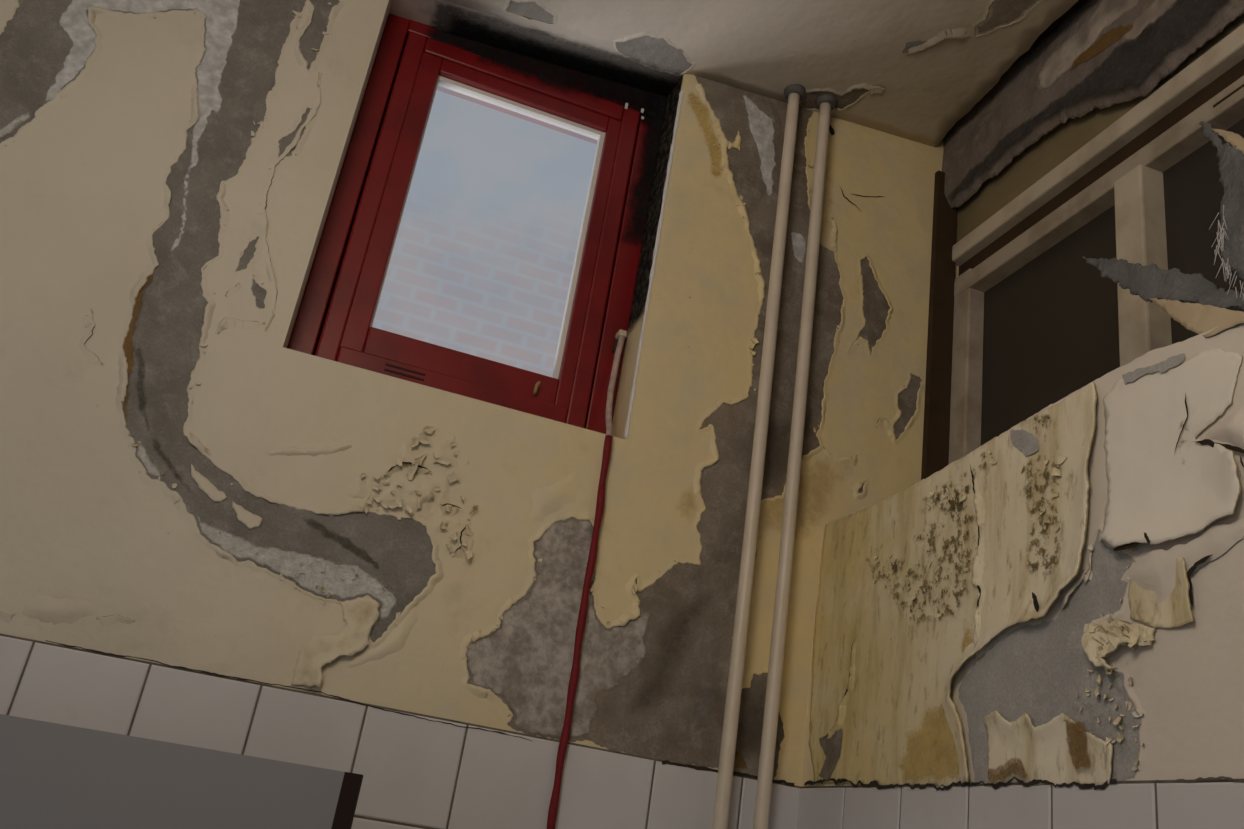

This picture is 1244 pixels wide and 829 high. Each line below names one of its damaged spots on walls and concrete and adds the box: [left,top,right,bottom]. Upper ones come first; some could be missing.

peeling [502,0,558,27]
peeling [612,31,696,76]
peeling [902,28,972,56]
spalling [799,83,872,135]
peeling [0,0,444,687]
peeling [844,252,893,361]
damp [459,76,848,779]
peeling [887,369,926,445]
peeling [808,382,1244,786]
crack [1157,775,1244,783]